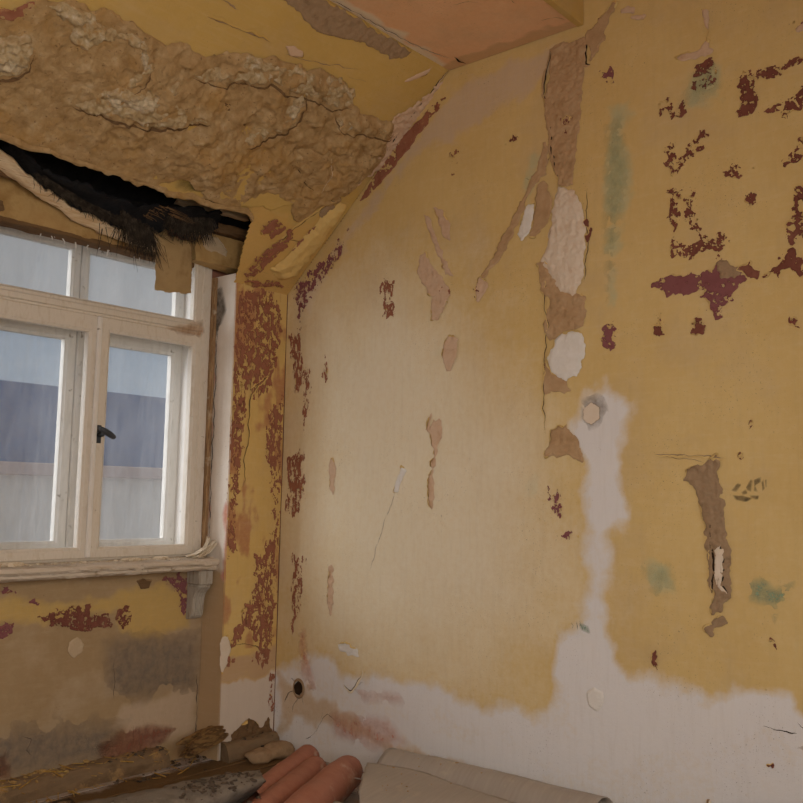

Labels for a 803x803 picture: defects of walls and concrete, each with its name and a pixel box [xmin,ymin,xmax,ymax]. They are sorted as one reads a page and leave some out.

spalling [473,1,618,302]
peeling [663,130,709,176]
peeling [736,56,803,118]
peeling [783,136,803,167]
spalling [0,0,451,559]
spalling [536,261,587,395]
peeling [600,324,617,351]
peeling [651,186,803,336]
spalling [543,424,584,463]
peeling [38,604,132,632]
peeling [220,395,306,741]
spalling [683,453,732,637]